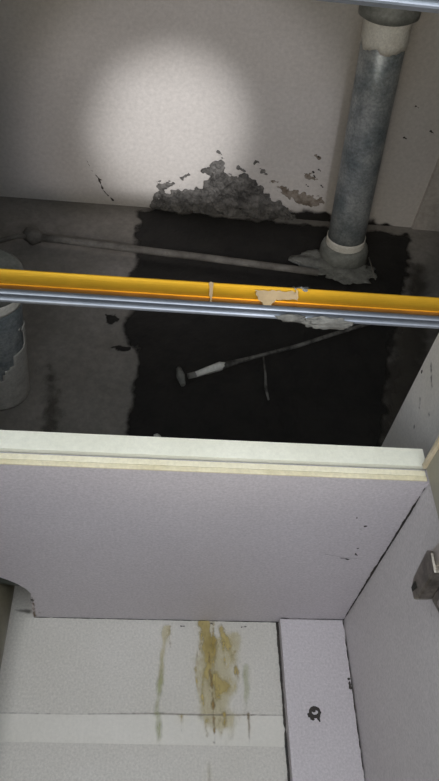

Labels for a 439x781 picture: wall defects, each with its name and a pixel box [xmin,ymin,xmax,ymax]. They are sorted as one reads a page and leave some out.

spalling [149,150,325,220]
damp [196,621,231,733]